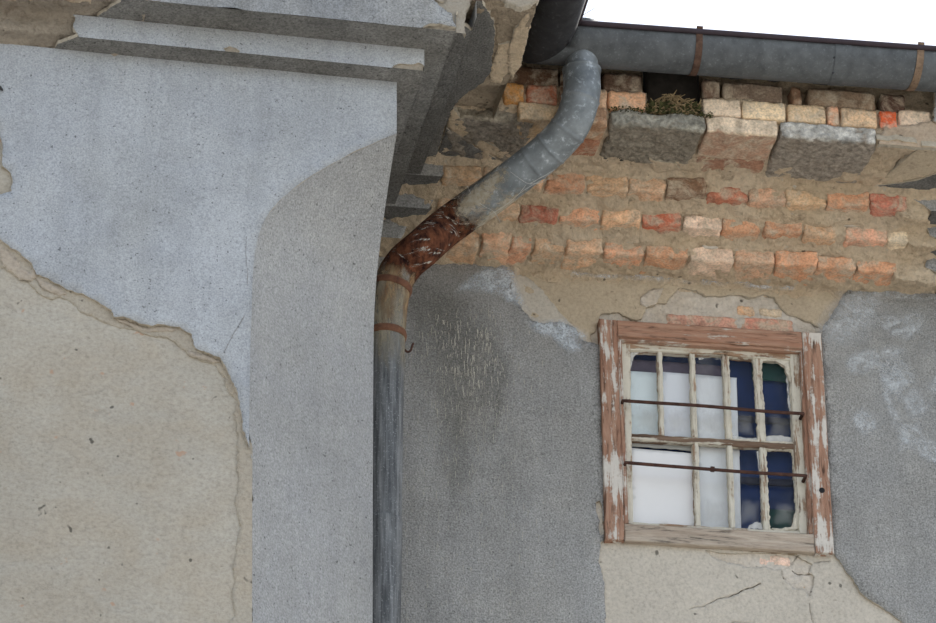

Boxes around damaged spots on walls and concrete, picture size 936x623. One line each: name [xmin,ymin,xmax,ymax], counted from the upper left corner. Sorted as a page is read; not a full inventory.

flaking render [0,0,145,48]
flaking render [379,0,563,257]
water stain [461,268,520,301]
flaking render [435,69,936,344]
flaking render [0,241,253,623]
water stain [405,308,584,621]
flaking render [596,502,901,623]